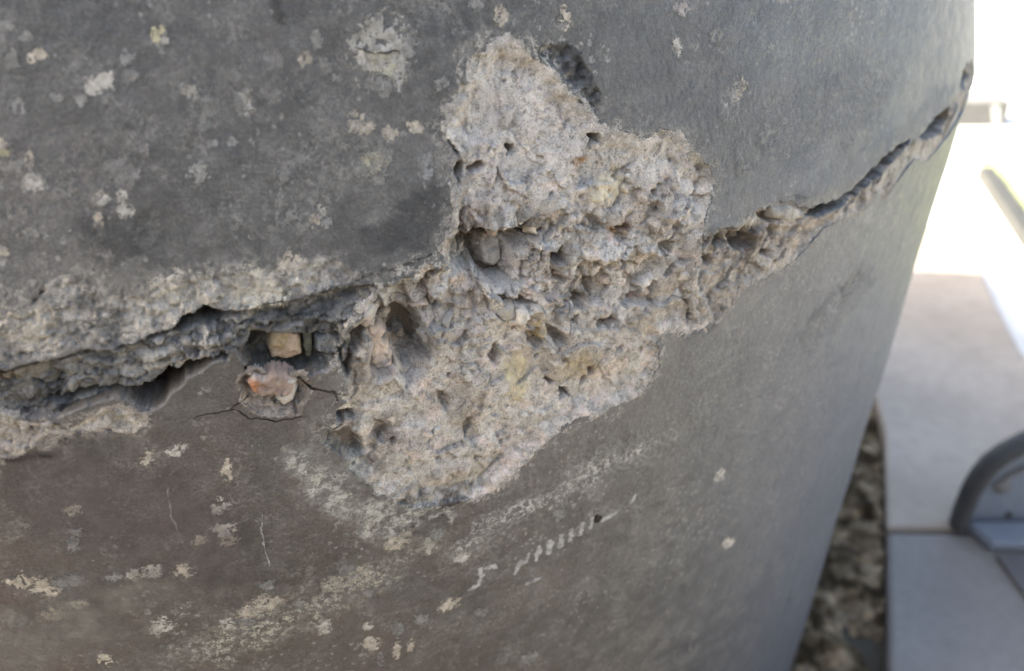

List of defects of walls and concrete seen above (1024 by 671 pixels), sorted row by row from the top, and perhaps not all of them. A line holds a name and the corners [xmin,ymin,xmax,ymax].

spalling [0,0,973,556]
crack [193,376,345,446]
peeling [320,563,376,598]
peeling [452,550,471,564]
peeling [362,596,461,667]